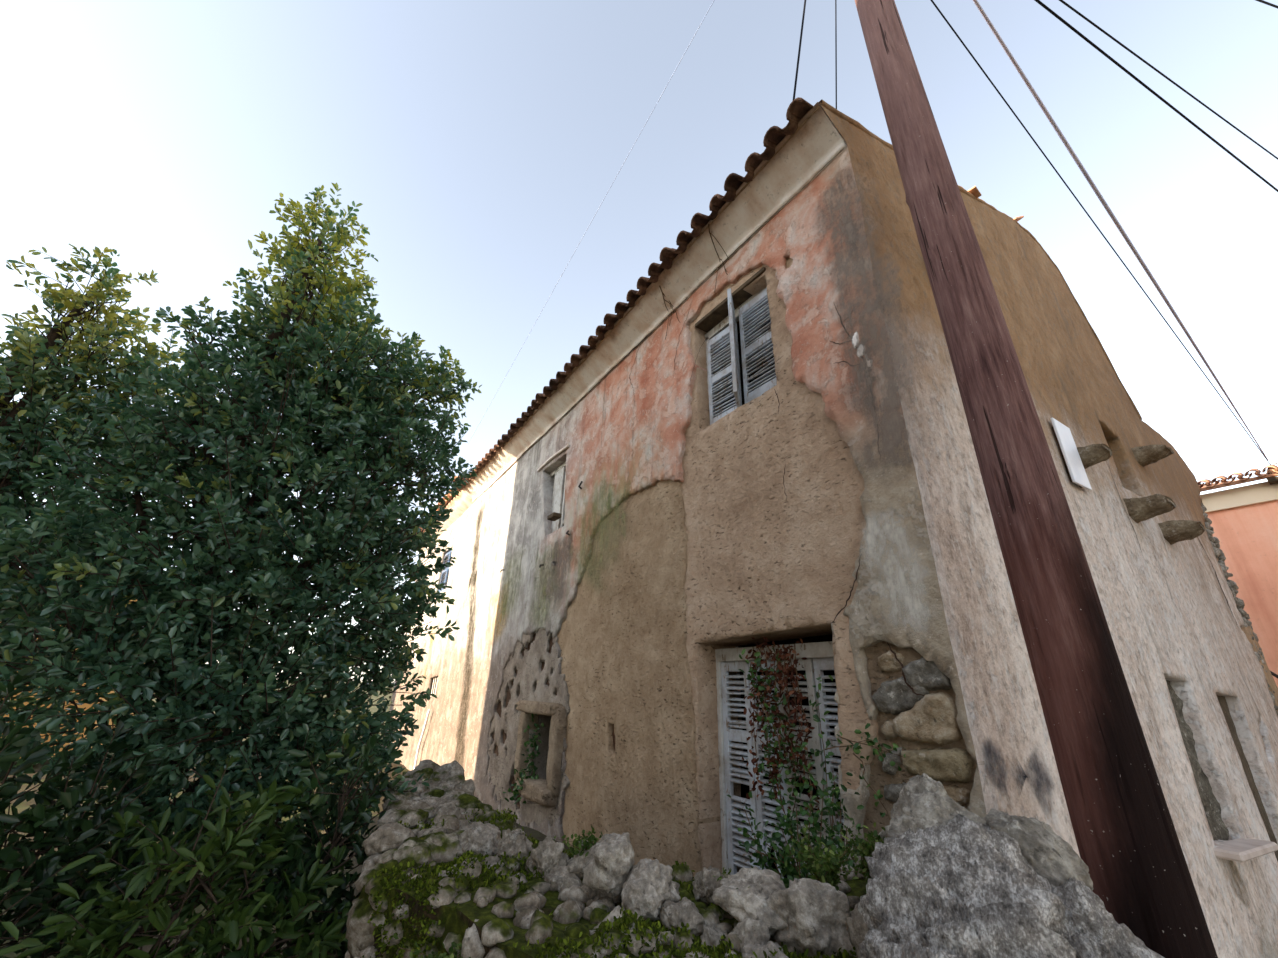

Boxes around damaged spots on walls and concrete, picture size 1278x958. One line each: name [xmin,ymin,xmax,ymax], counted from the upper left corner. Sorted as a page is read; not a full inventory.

peeling [487,257,866,880]
crack [831,554,862,623]
spalling [863,641,978,843]